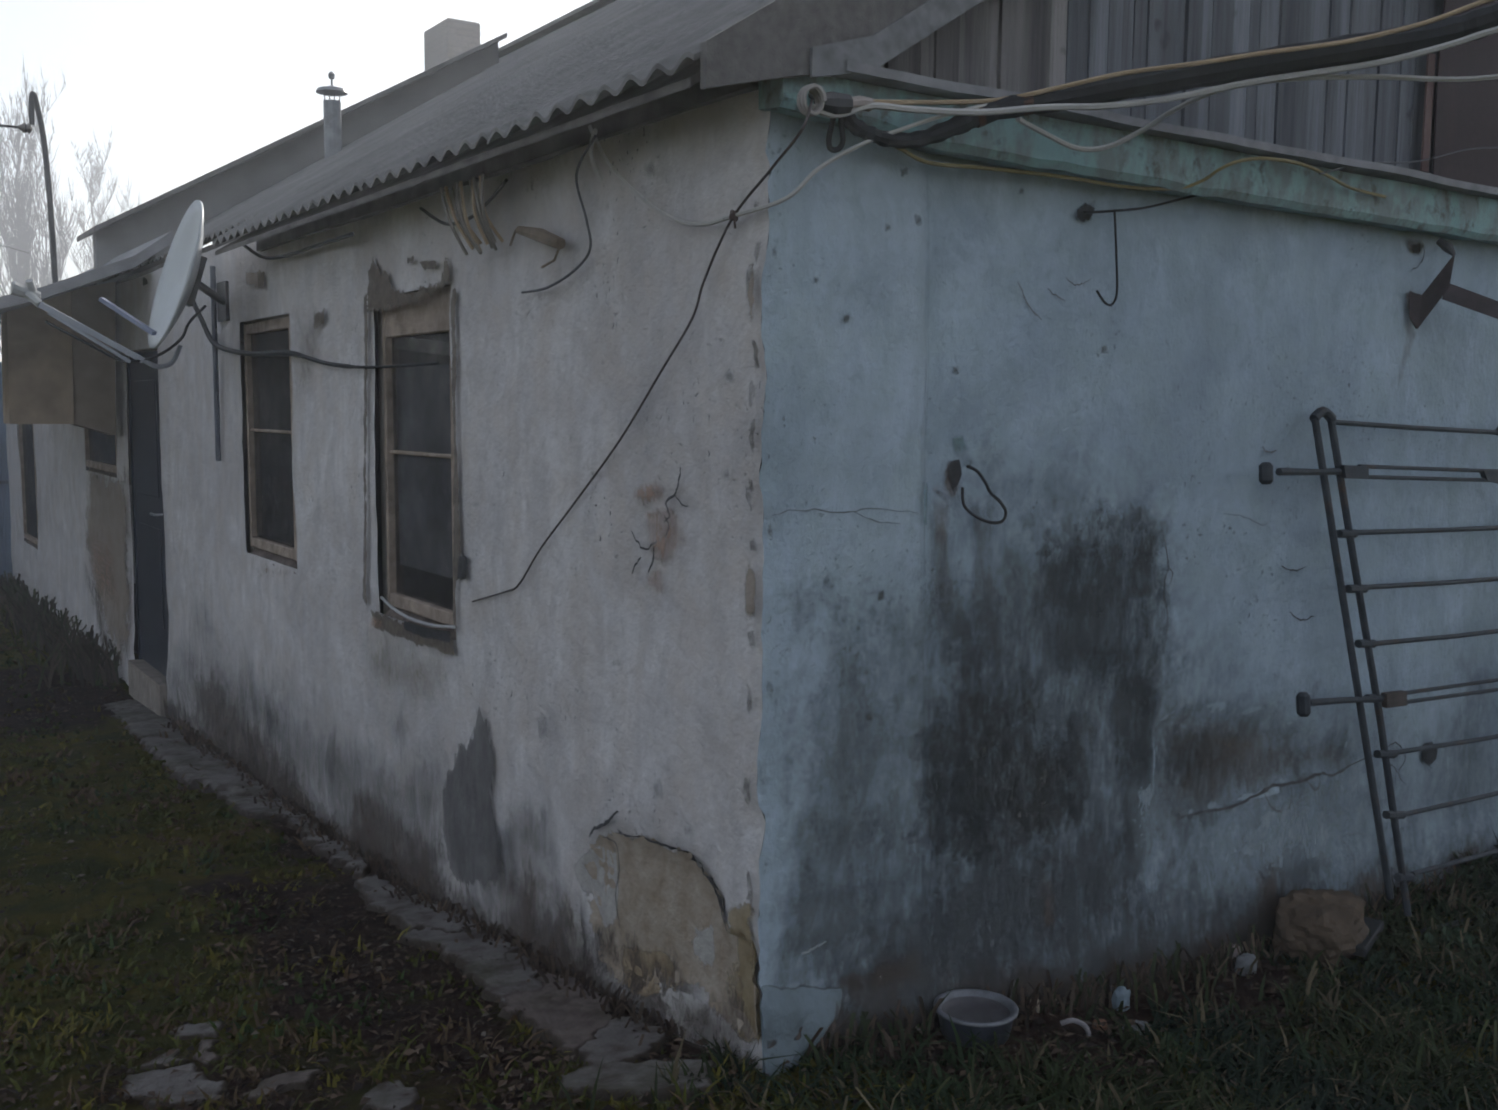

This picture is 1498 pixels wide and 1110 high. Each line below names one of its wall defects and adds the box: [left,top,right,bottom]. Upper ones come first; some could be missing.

spalling [362,256,467,656]
spalling [745,529,772,639]
water stain [164,539,1319,1071]
crack [1177,741,1406,819]
spalling [560,831,758,1043]